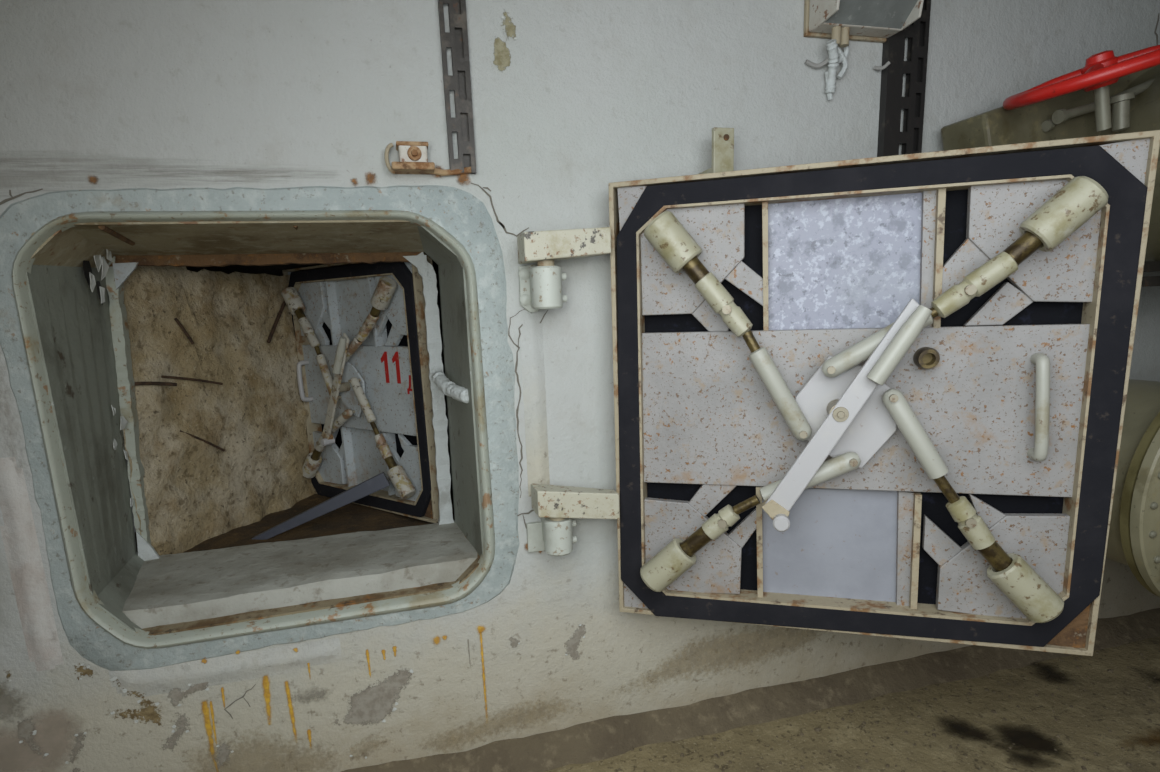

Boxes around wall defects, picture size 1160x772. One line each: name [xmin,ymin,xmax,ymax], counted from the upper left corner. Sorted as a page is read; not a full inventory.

peeling [493,12,517,71]
crack [0,188,43,205]
crack [471,183,529,237]
crack [508,309,548,529]
peeling [109,676,209,751]
corrosion [202,687,225,772]
corrosion [263,676,271,724]
corrosion [285,681,311,747]
spalling [335,668,413,725]
corrosion [468,626,487,715]
spalling [564,624,586,660]